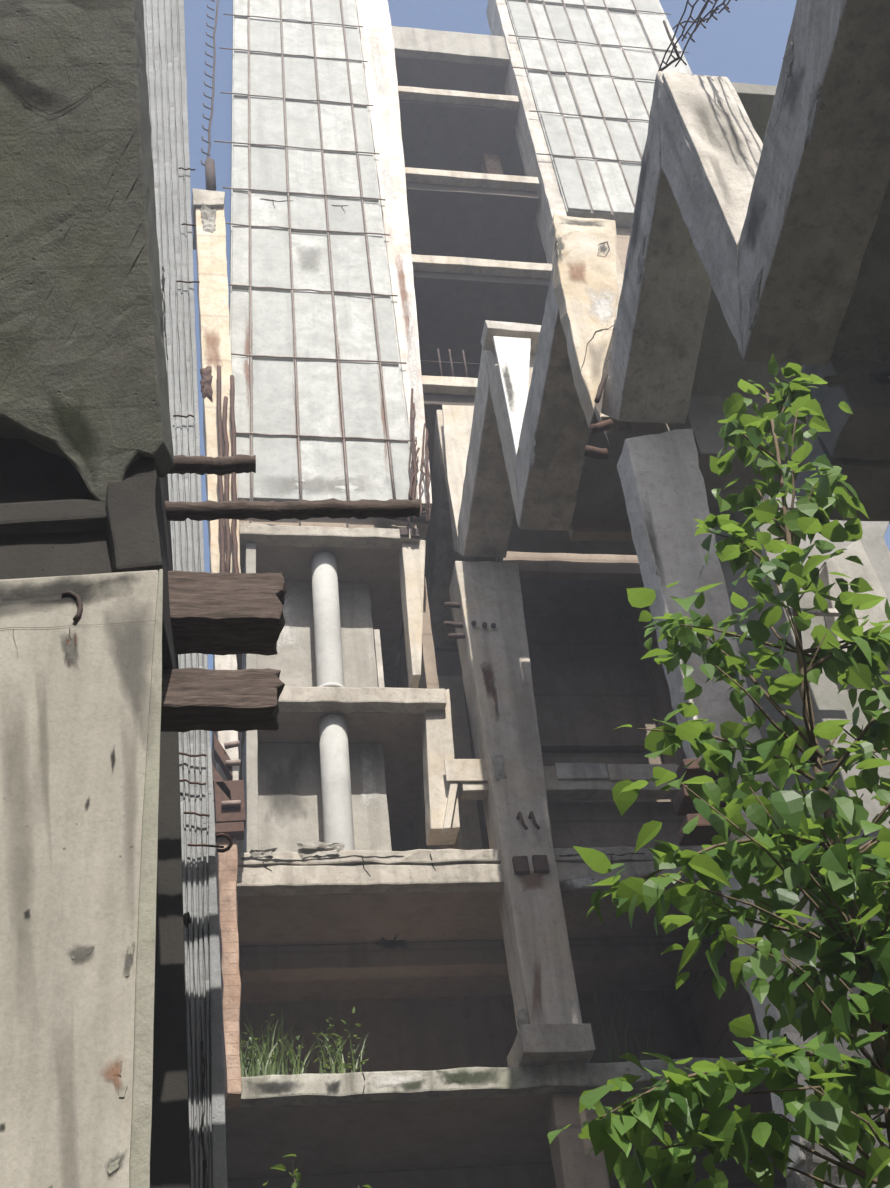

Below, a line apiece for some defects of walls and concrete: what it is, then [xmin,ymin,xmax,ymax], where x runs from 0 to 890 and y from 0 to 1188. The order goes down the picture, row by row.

rust [571,266,583,279]
rust [207,334,219,362]
crack [582,324,615,366]
leakage [116,625,143,703]
rust [482,666,498,714]
leakage [256,1082,294,1093]
leakage [377,1076,411,1085]